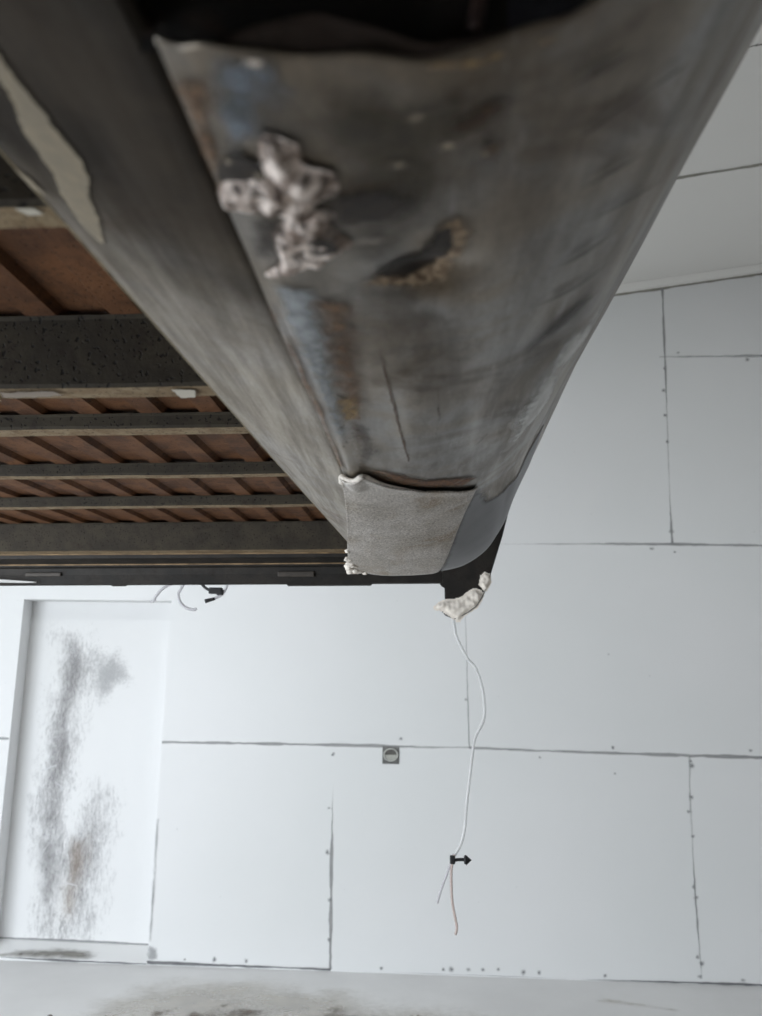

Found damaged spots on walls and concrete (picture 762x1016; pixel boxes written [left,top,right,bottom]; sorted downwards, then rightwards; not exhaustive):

peeling [0,57,104,245]
peeling [218,134,354,278]